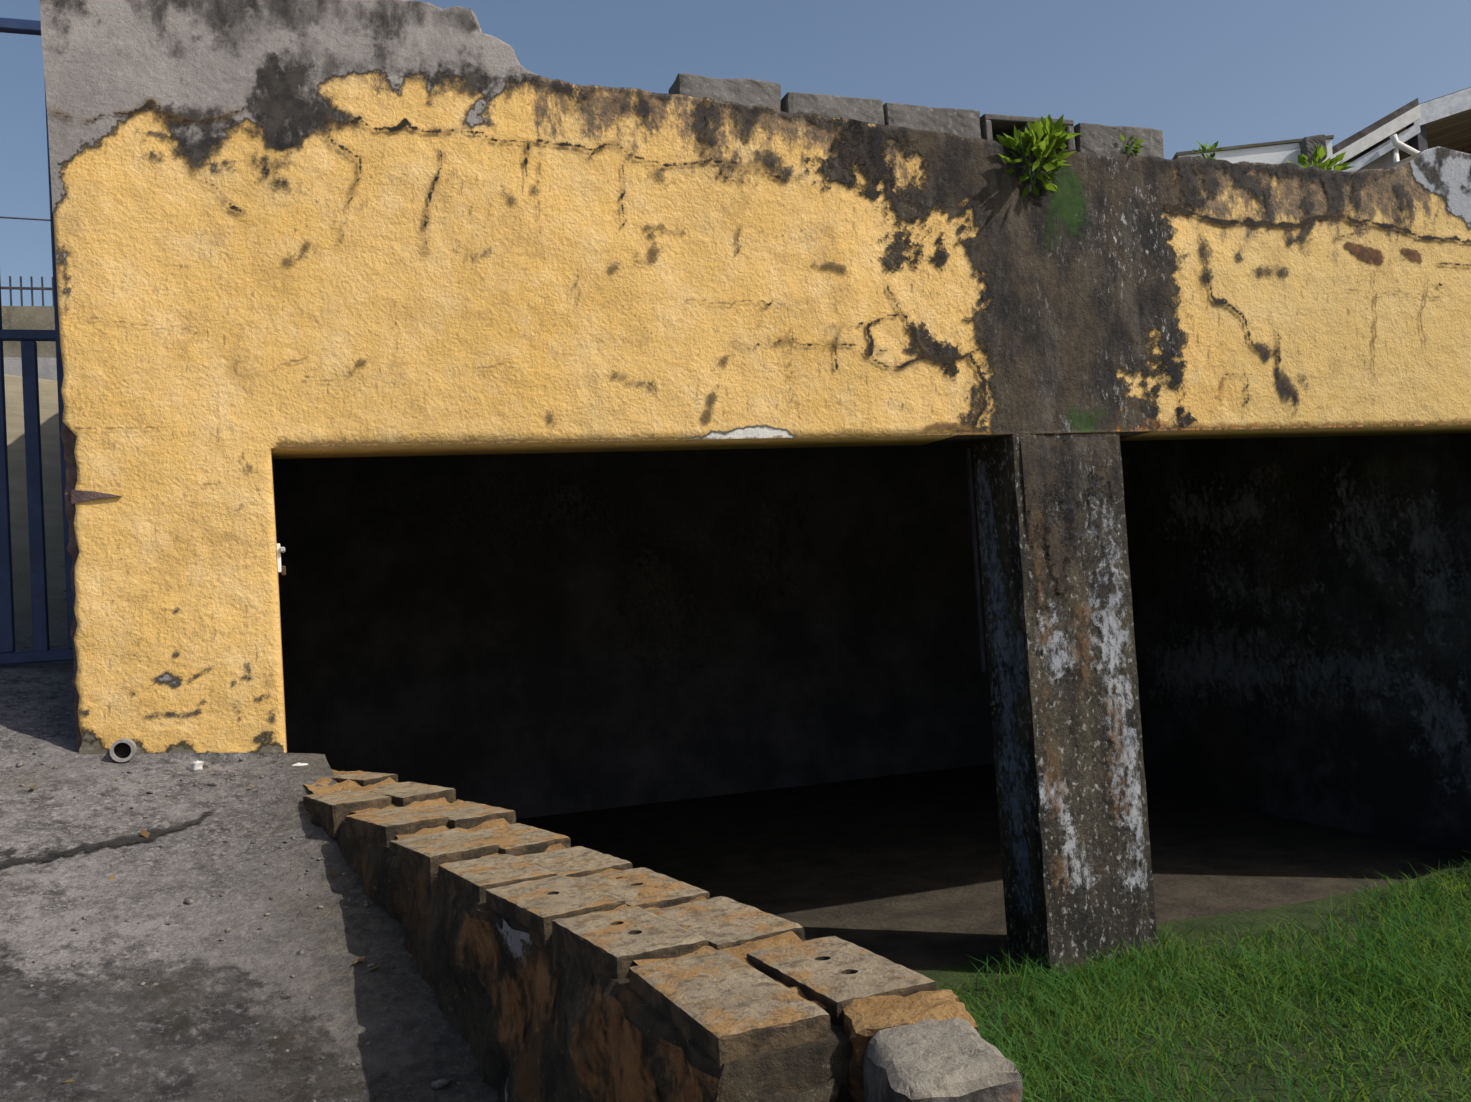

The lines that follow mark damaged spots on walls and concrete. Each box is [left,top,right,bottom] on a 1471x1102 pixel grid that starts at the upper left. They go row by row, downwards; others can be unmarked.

damp [152,0,325,46]
damp [157,49,360,190]
flaking render [40,0,540,213]
crack [327,97,803,245]
flaking render [1408,146,1471,230]
damp [1415,147,1471,201]
crack [686,286,989,430]
damp [407,63,1415,650]
crack [1164,203,1471,414]
spalling [686,424,796,440]
flaking render [152,651,211,688]
crack [0,809,216,868]